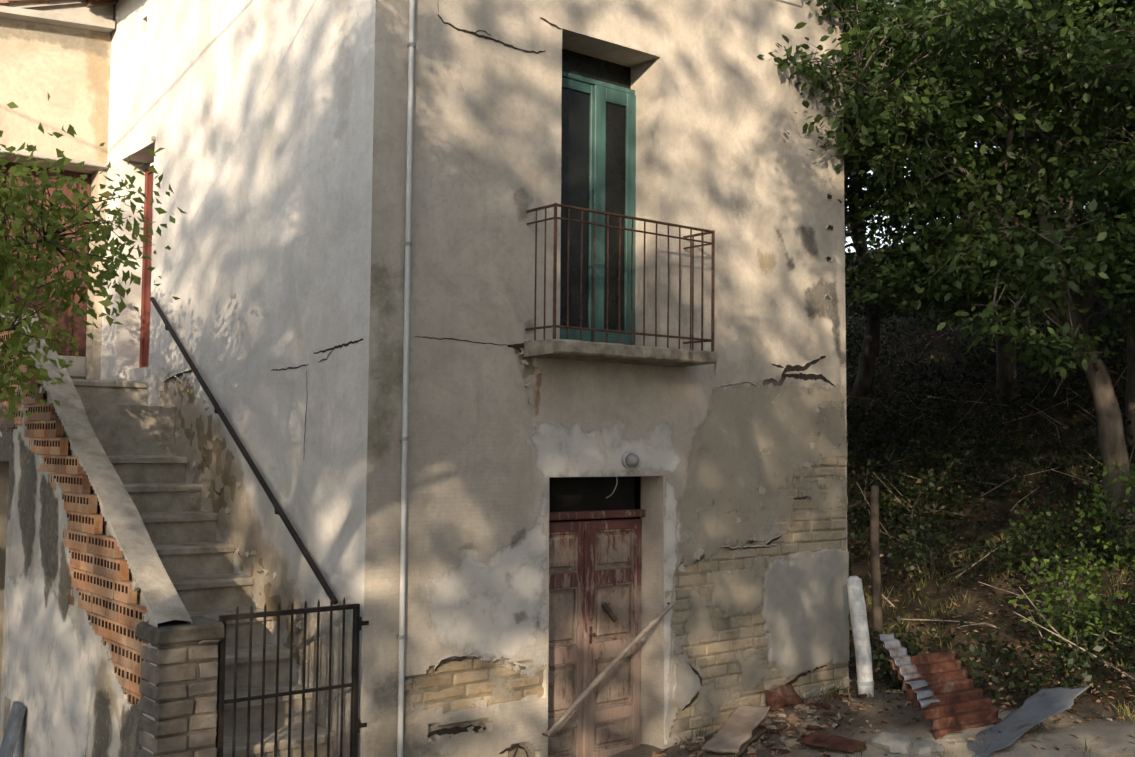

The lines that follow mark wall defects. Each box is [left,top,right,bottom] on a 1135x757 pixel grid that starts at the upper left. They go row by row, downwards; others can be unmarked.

crack [438,7,562,54]
crack [271,338,363,442]
crack [416,336,524,355]
crack [718,355,836,388]
spalling [0,325,152,710]
spalling [658,400,848,745]
spalling [404,653,549,743]